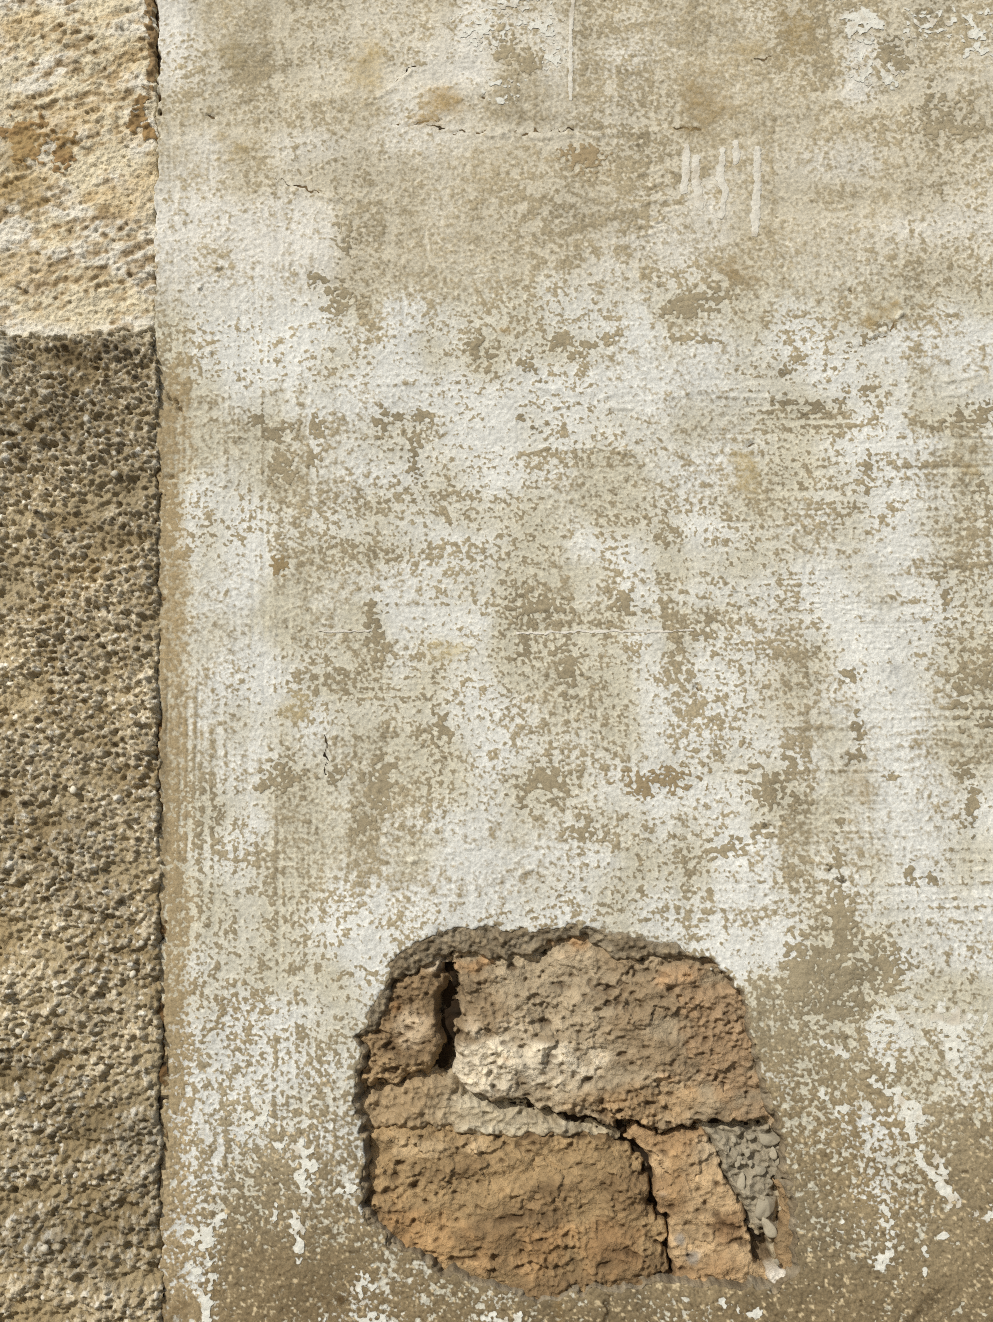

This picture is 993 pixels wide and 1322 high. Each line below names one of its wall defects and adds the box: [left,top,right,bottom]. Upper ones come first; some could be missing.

crack [435,959,462,1068]
peeling [219,1097,280,1138]
spalling [270,923,801,1322]
crack [681,1117,760,1125]
crack [510,1101,671,1269]